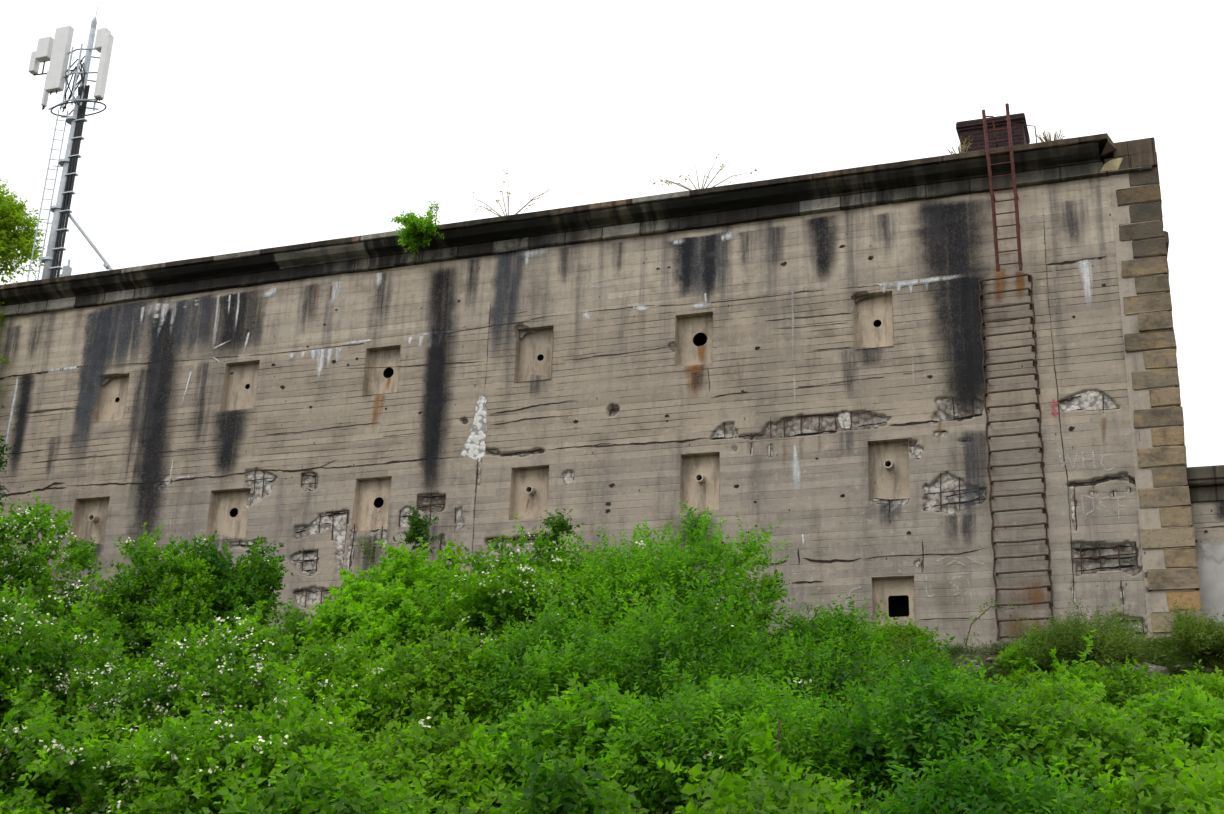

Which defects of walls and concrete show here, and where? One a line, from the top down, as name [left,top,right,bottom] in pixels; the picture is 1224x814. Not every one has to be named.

damp [671,233,748,307]
damp [808,216,835,276]
damp [879,201,985,396]
damp [49,288,276,535]
damp [408,269,454,476]
corrosion [688,346,704,390]
spalling [712,411,889,458]
spalling [1059,391,1119,413]
spalling [243,471,278,512]
spalling [923,473,986,514]
spalling [291,488,464,610]
spalling [1068,475,1148,637]